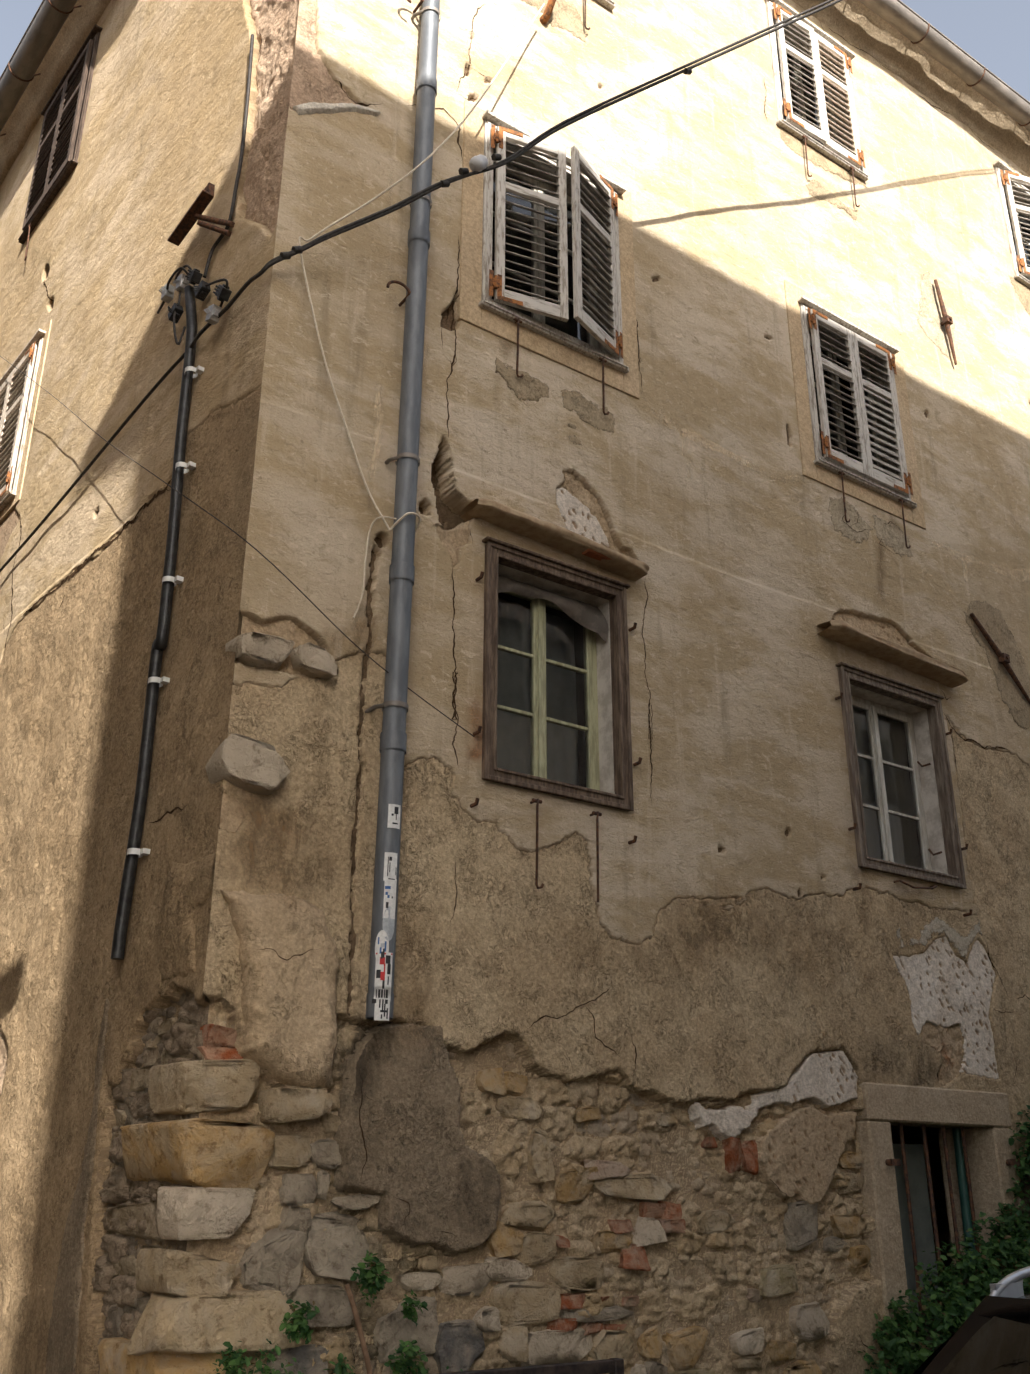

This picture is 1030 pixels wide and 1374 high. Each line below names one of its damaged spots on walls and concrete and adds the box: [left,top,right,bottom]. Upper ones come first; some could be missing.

flaking render [243,0,358,234]
crack [339,4,488,159]
crack [3,479,172,655]
crack [451,530,473,768]
crack [642,586,653,803]
flaking render [0,385,1030,1374]